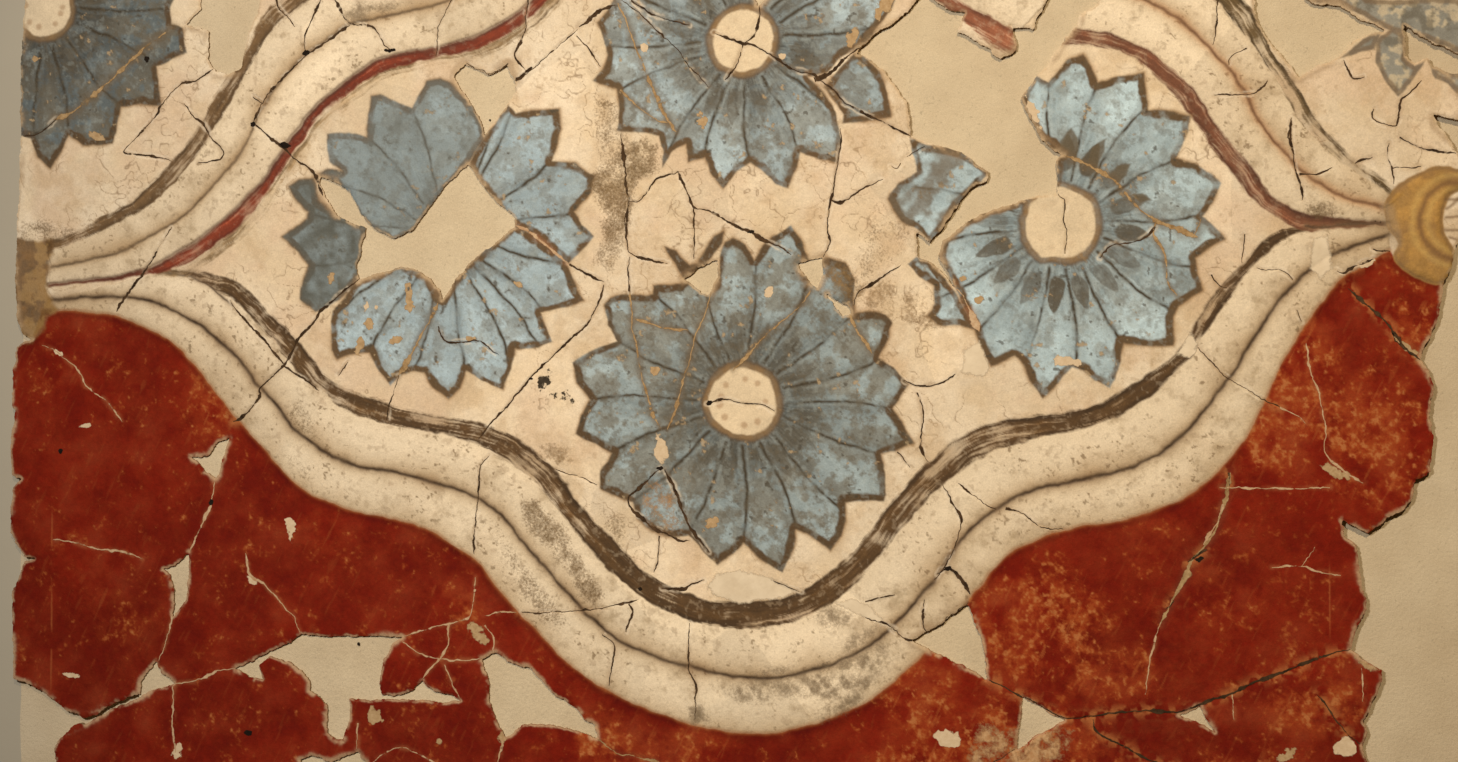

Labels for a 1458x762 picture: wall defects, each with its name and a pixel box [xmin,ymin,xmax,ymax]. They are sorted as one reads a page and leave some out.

crack [253,0,389,195]
flaking render [846,0,1098,287]
crack [1287,61,1455,200]
crack [231,279,359,422]
crack [386,0,923,720]
crack [865,374,1062,641]
crack [988,234,1364,762]
flaking render [165,554,189,616]
flaking render [236,634,460,762]
flaking render [467,622,598,743]
peeling [933,729,961,748]
peeling [1333,736,1357,756]